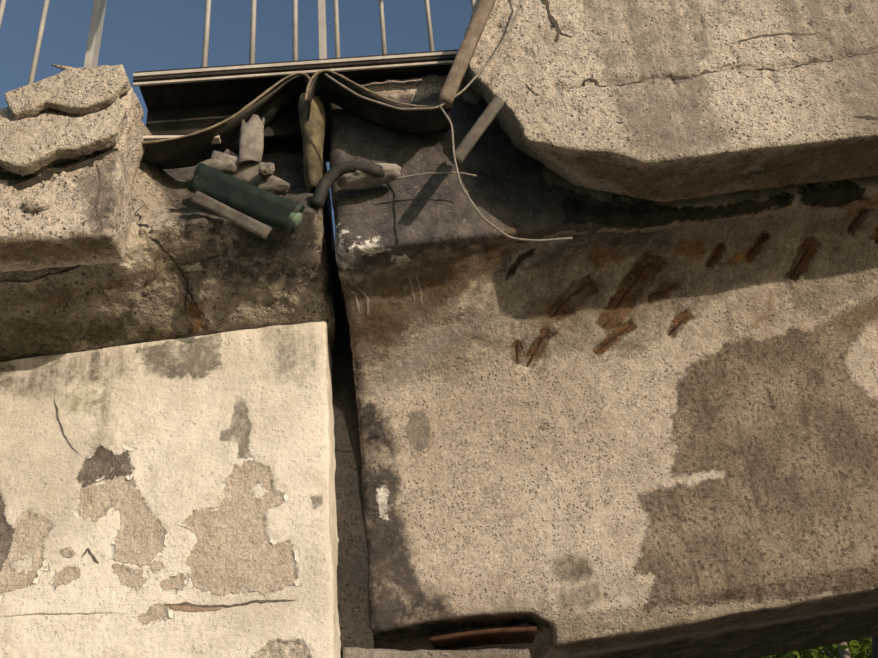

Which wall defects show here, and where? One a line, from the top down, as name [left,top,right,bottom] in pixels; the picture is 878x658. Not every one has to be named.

peeling [0,64,130,175]
crack [572,52,874,87]
crack [730,32,815,44]
crack [0,148,118,225]
crack [0,265,81,282]
crack [135,201,213,328]
peeling [73,402,302,627]
leakage [353,359,550,643]
leakage [550,296,878,654]
peeling [252,636,315,658]